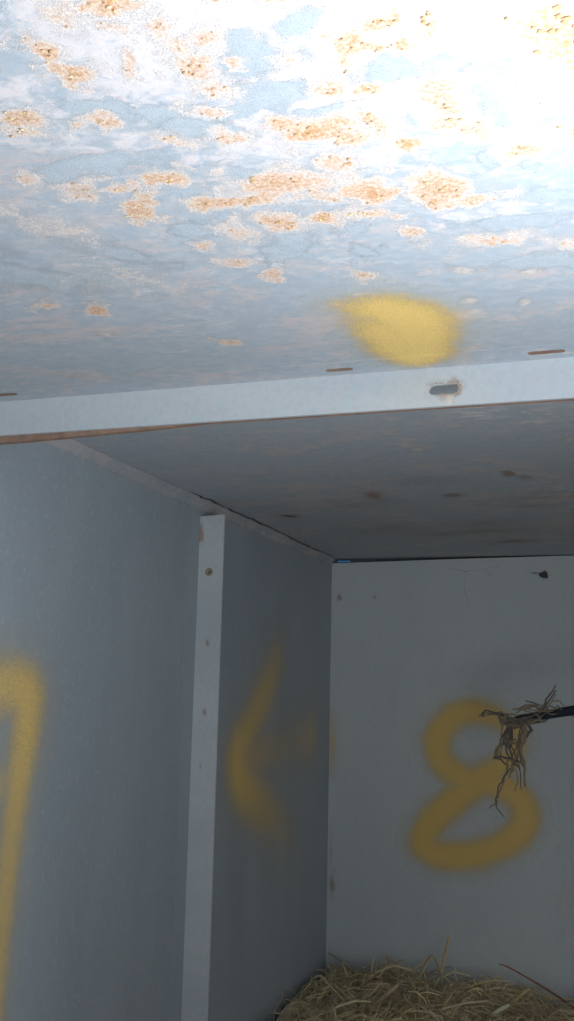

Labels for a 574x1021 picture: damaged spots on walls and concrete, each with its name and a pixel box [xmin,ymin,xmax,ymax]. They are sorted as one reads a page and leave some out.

rust [0,0,574,286]